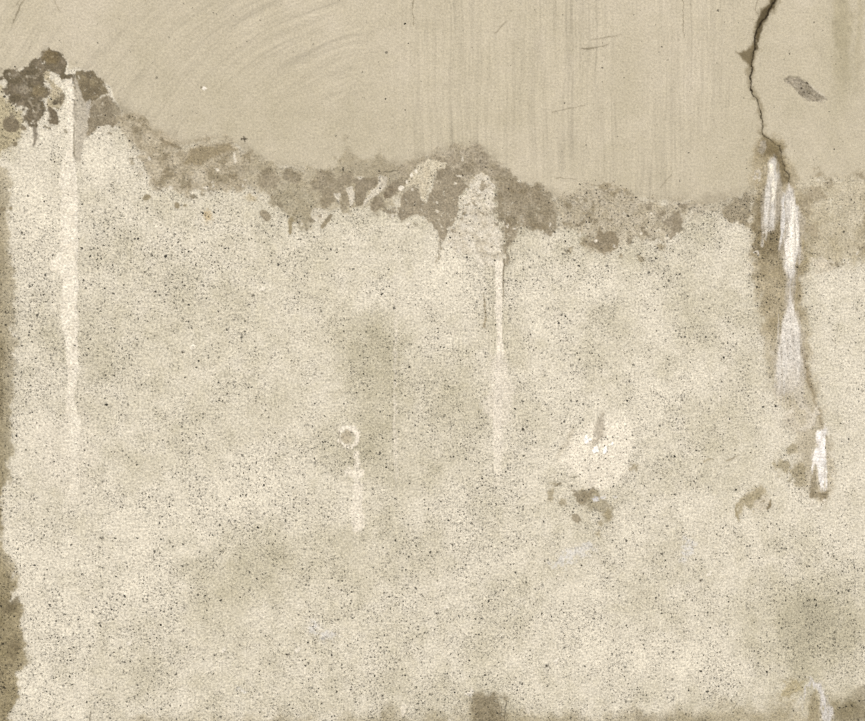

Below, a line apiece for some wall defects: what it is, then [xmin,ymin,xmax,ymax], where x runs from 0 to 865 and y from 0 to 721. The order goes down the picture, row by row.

crack [734,0,791,184]
spalling [782,75,829,104]
damp [828,0,865,125]
peeling [0,46,761,271]
peeling [790,165,865,277]
damp [49,77,82,498]
damp [493,258,506,351]
damp [723,131,839,523]
damp [0,158,57,721]
damp [343,448,368,534]
damp [546,479,620,540]
damp [91,672,865,721]